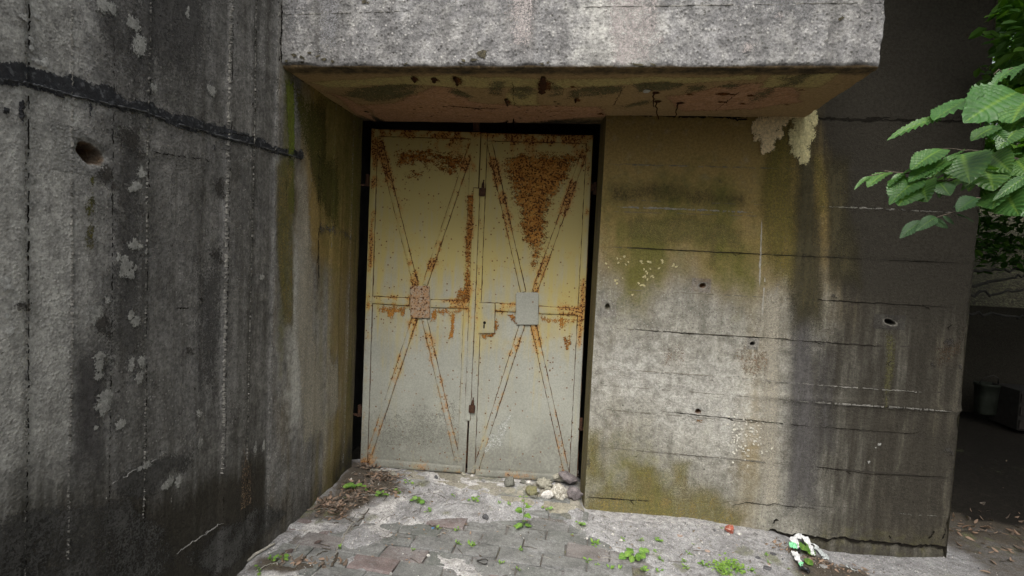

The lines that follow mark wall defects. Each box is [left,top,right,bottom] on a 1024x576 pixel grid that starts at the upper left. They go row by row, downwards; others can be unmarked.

water stain [97,0,214,111]
spalling [51,121,122,182]
water stain [72,113,151,471]
water stain [186,227,229,407]
water stain [288,152,351,442]
corrosion [377,305,405,319]
corrosion [394,146,464,183]
corrosion [430,191,473,339]
corrosion [502,149,579,267]
corrosion [541,316,575,350]
water stain [323,72,859,509]
water stain [0,449,286,576]